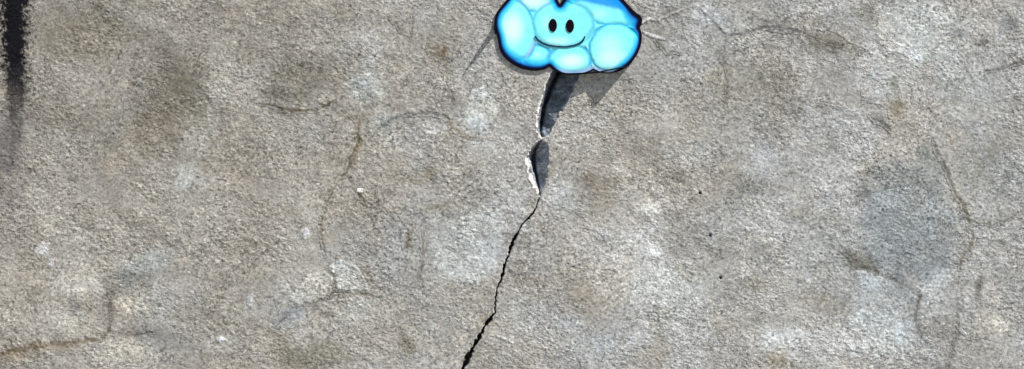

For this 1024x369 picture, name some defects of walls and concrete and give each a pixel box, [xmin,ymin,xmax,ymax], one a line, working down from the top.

crack [459,195,542,369]